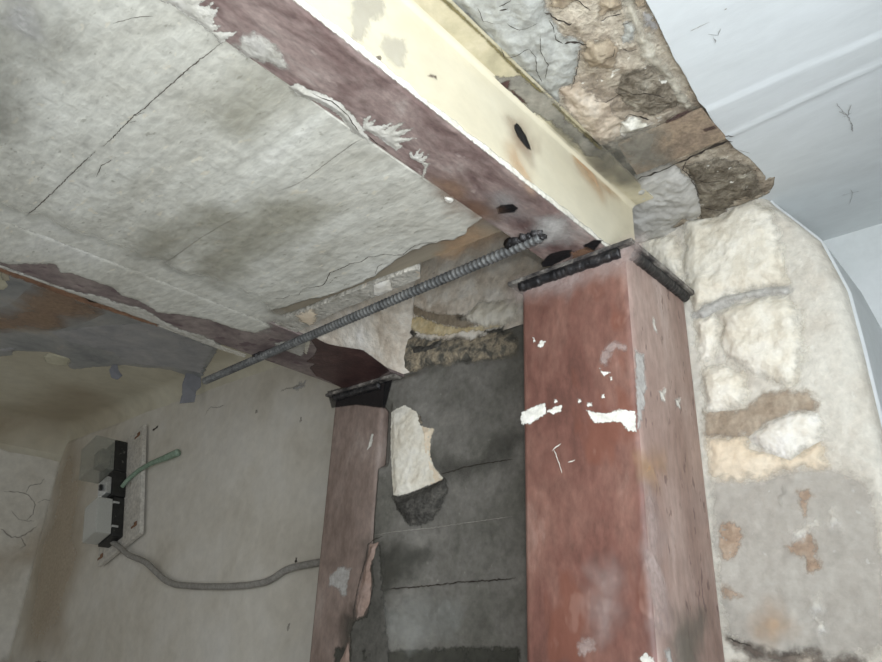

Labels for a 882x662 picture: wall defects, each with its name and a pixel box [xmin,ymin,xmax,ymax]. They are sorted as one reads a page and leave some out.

crack [478,0,633,85]
flaking render [495,0,691,157]
crack [27,43,221,215]
peeling [0,268,221,404]
flaking render [390,405,443,496]
peeling [520,400,562,425]
peeling [578,351,646,432]
crack [1,479,50,548]
flaking render [353,536,383,621]
crack [385,577,516,590]
peeling [647,498,663,631]
flaking render [340,643,351,662]